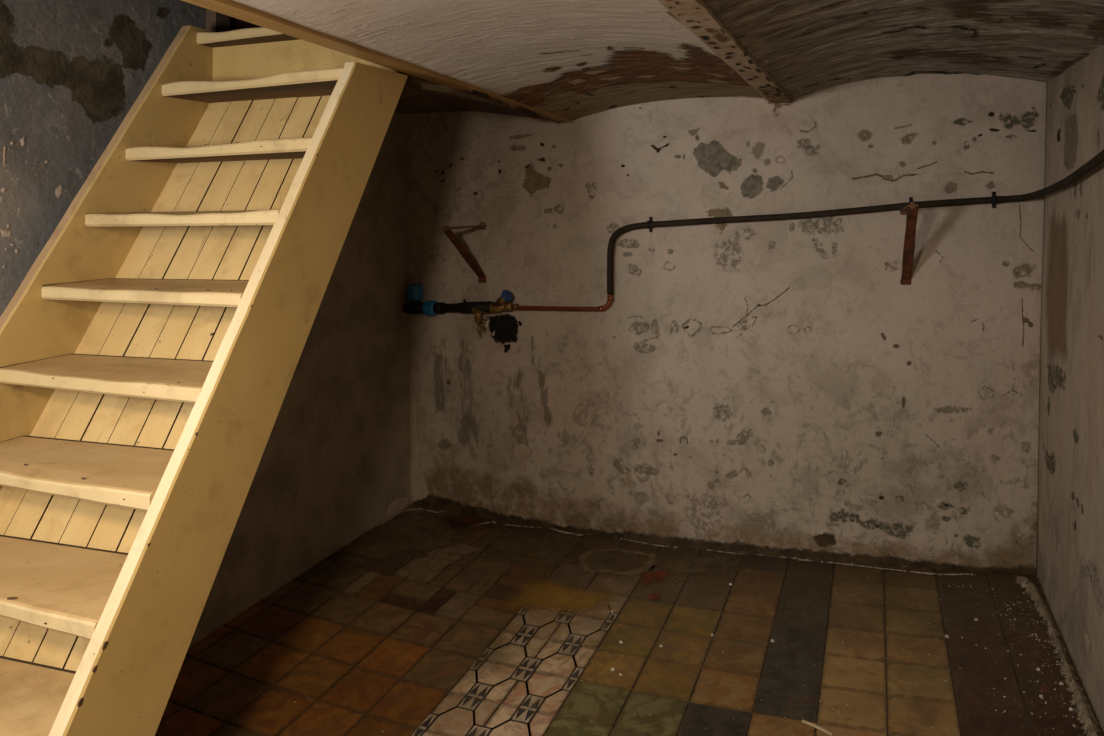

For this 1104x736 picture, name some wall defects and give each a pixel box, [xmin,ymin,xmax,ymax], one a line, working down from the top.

peeling [462,44,750,123]
spalling [522,143,563,197]
spalling [651,128,793,200]
spalling [485,313,522,353]
leakage [407,467,1036,575]